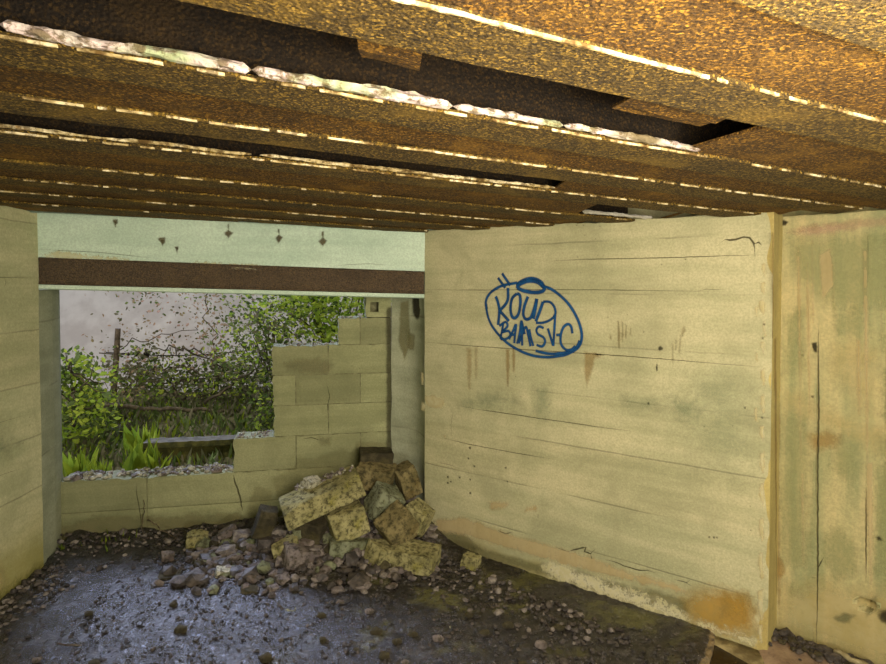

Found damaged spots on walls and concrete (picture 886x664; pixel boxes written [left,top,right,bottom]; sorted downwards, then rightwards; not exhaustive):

rust [357,39,422,71]
rust [431,0,886,118]
rust [0,65,886,209]
leakage [441,531,757,646]